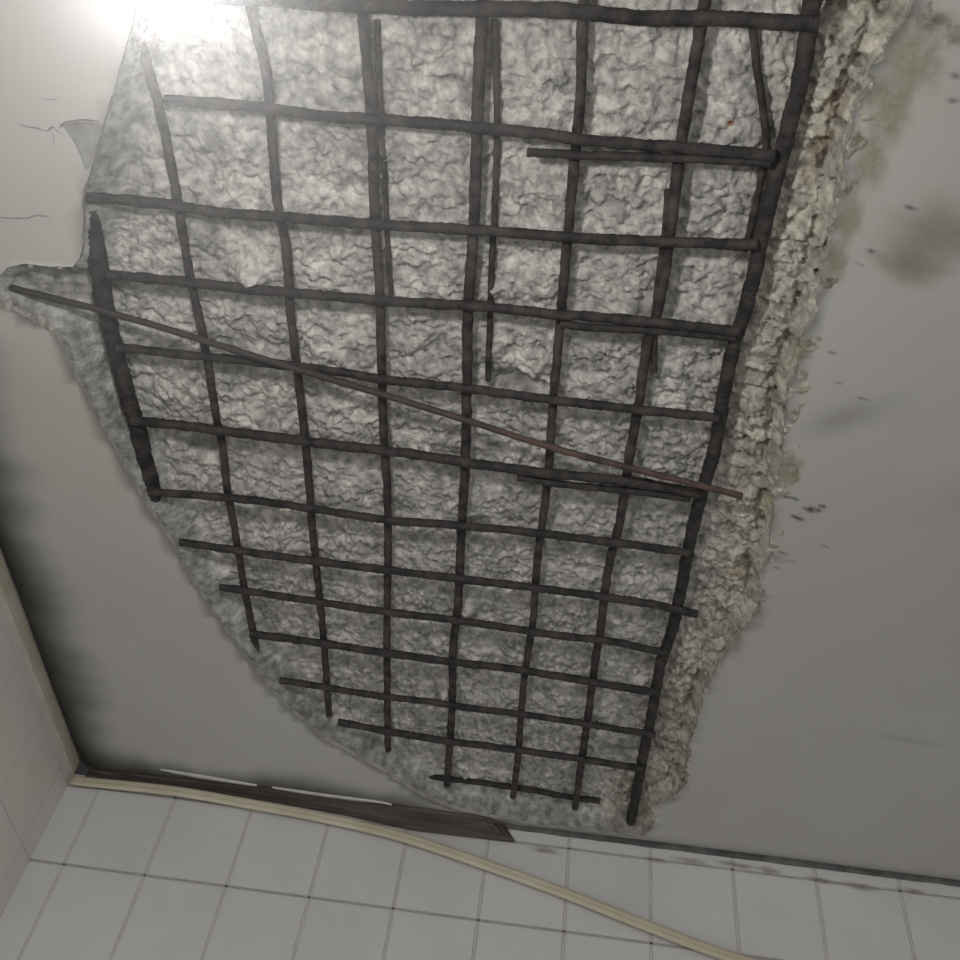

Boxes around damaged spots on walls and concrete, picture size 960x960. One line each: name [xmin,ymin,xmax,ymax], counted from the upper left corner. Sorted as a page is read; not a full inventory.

crack [0,212,53,220]
crack [19,124,63,144]
spalling [59,3,264,199]
spalling [163,103,274,211]
spalling [257,6,365,113]
spalling [276,116,370,218]
spalling [369,14,475,121]
spalling [377,126,471,225]
spalling [480,135,672,236]
spalling [483,16,799,150]
spalling [632,0,910,835]
spalling [0,196,694,834]